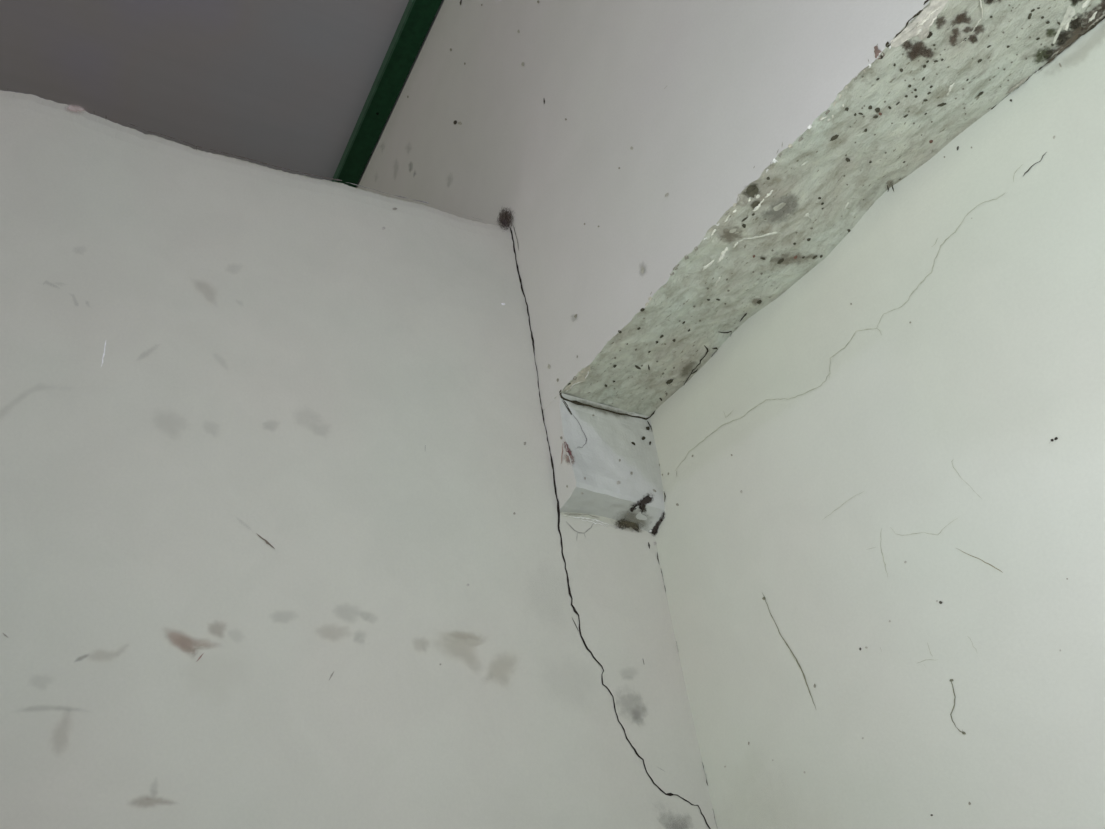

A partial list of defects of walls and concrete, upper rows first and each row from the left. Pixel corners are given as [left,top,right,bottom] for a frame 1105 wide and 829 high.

mould [903,41,933,60]
mould [936,13,984,45]
leakage [1036,0,1105,71]
crack [677,153,1046,468]
crack [510,226,715,829]